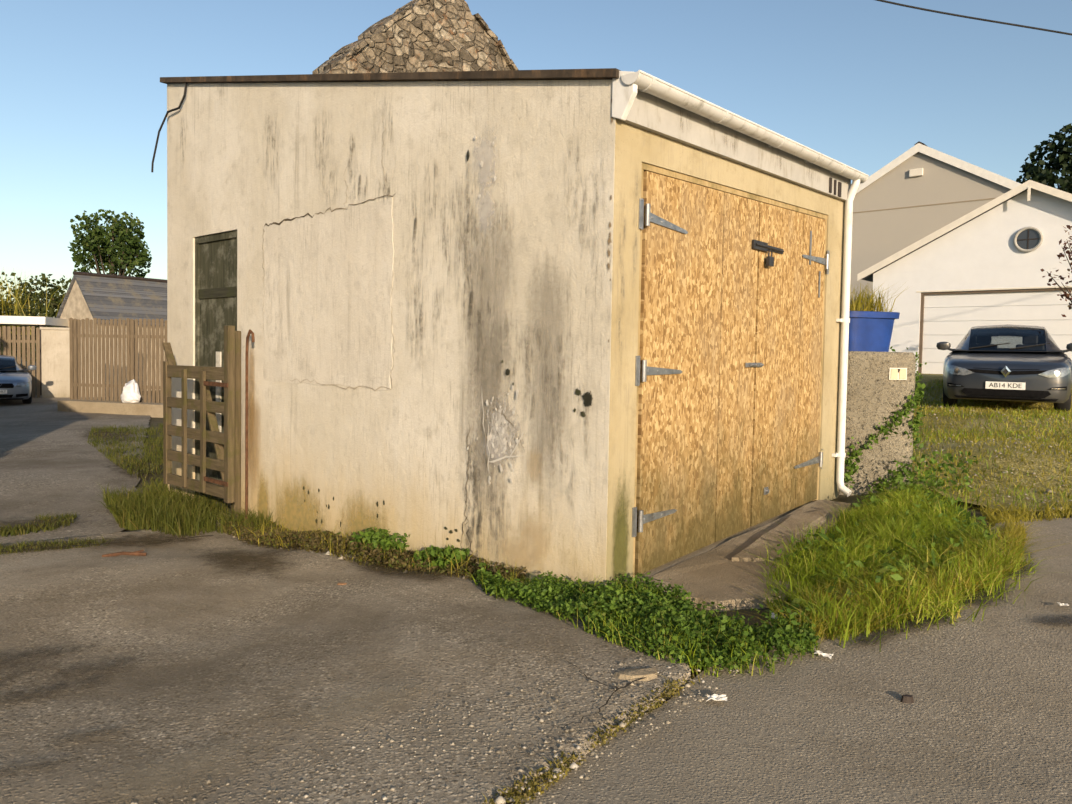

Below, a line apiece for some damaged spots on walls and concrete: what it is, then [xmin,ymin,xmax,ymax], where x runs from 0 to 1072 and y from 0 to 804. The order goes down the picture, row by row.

crack [262,117,395,329]
crack [290,278,395,391]
peeling [467,385,525,485]
leakage [277,489,320,532]
leakage [345,506,380,539]